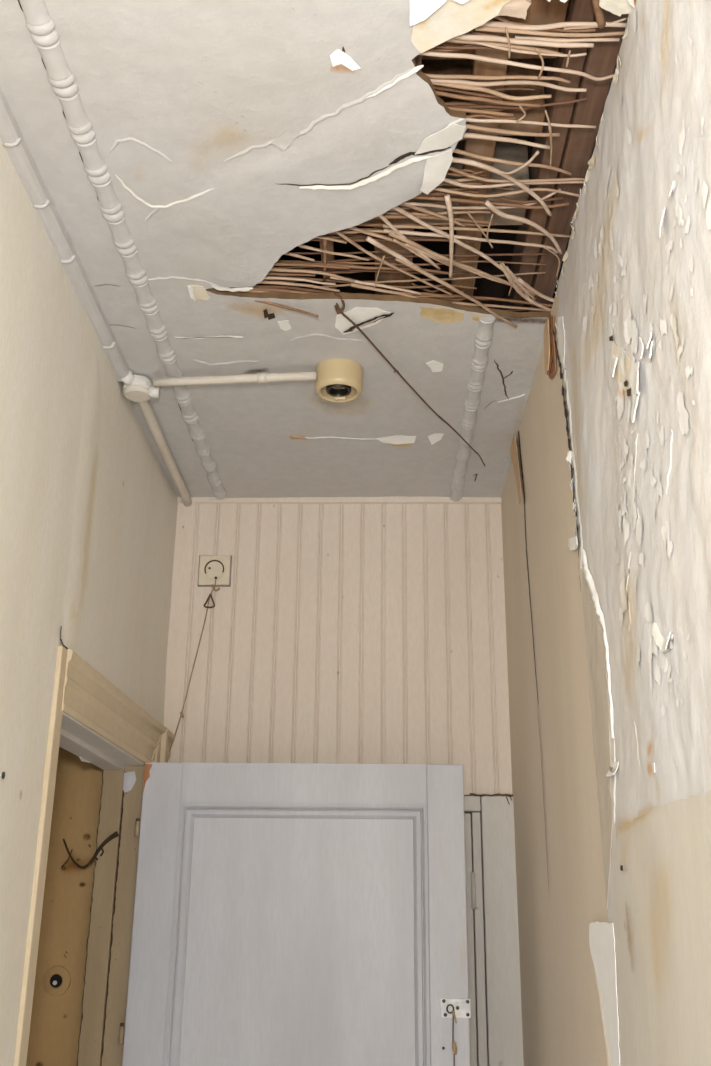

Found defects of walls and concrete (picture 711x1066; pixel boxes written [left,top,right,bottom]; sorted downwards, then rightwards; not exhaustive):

peeling [410,0,510,53]
peeling [330,47,361,71]
flaking render [613,56,622,107]
crack [280,118,466,195]
peeling [263,309,291,331]
flaking render [335,307,394,335]
crack [484,360,525,409]
peeling [555,120,711,626]
peeling [293,434,444,447]
crack [518,431,549,885]
peeling [636,602,690,717]
flaking render [581,571,613,907]